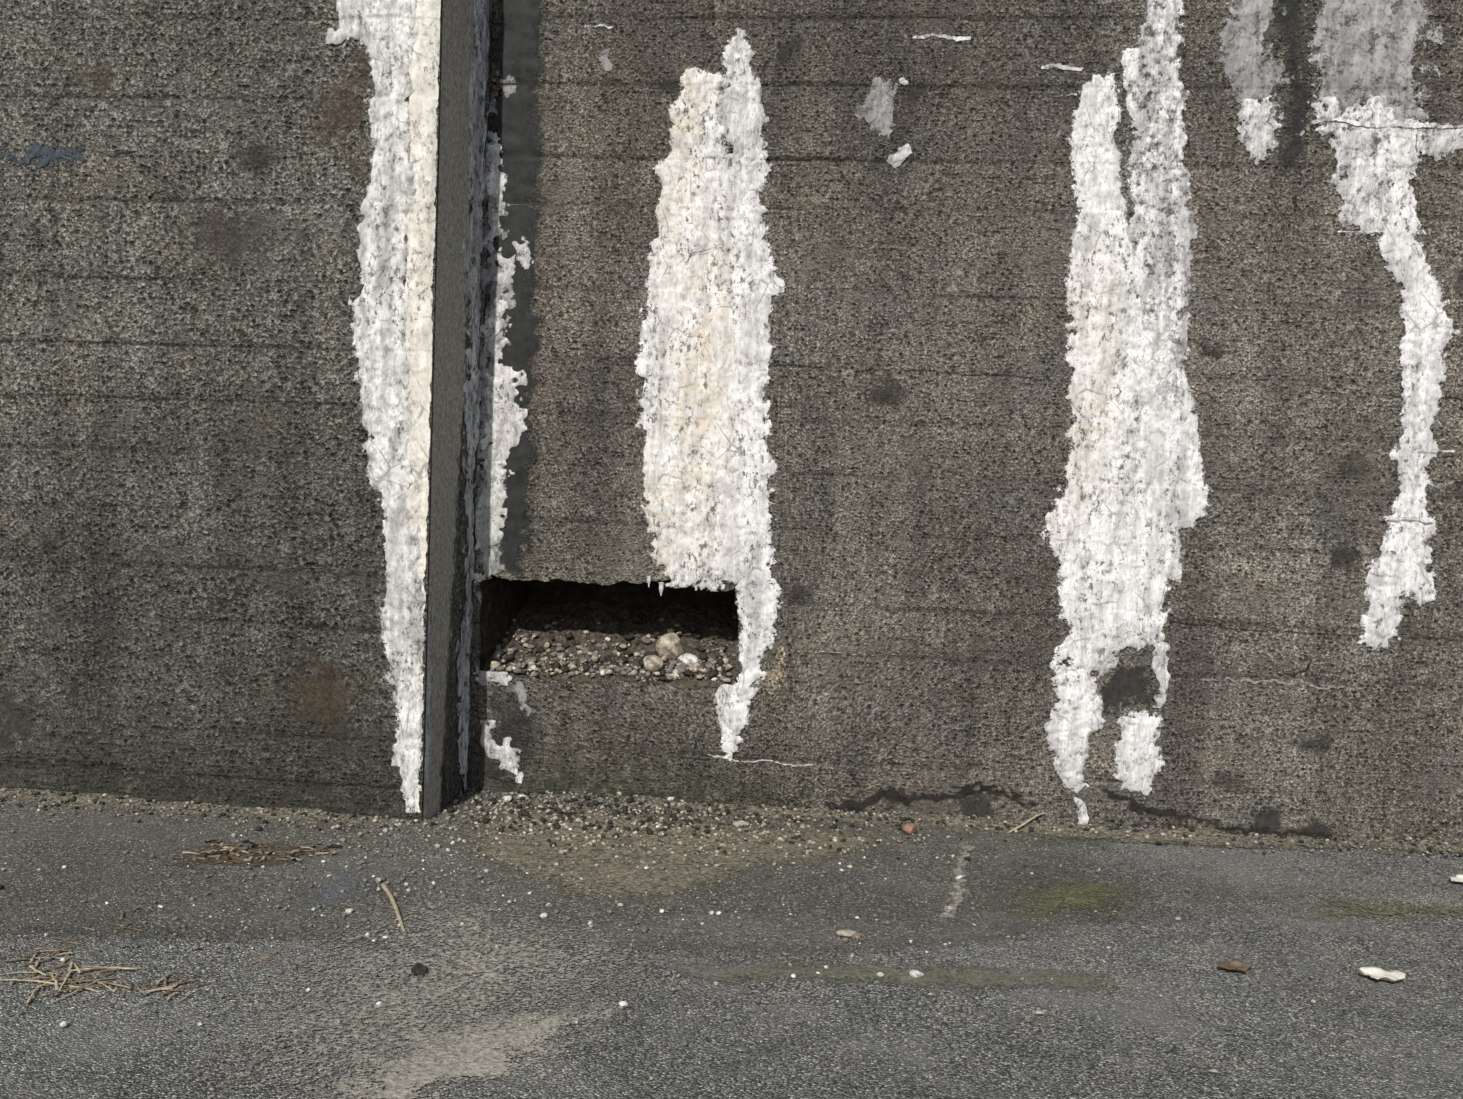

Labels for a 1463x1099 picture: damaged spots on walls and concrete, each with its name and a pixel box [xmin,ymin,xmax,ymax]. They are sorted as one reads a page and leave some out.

damp [325,0,441,813]
damp [454,0,545,795]
damp [631,28,901,767]
damp [1039,0,1213,824]
damp [1216,0,1463,651]